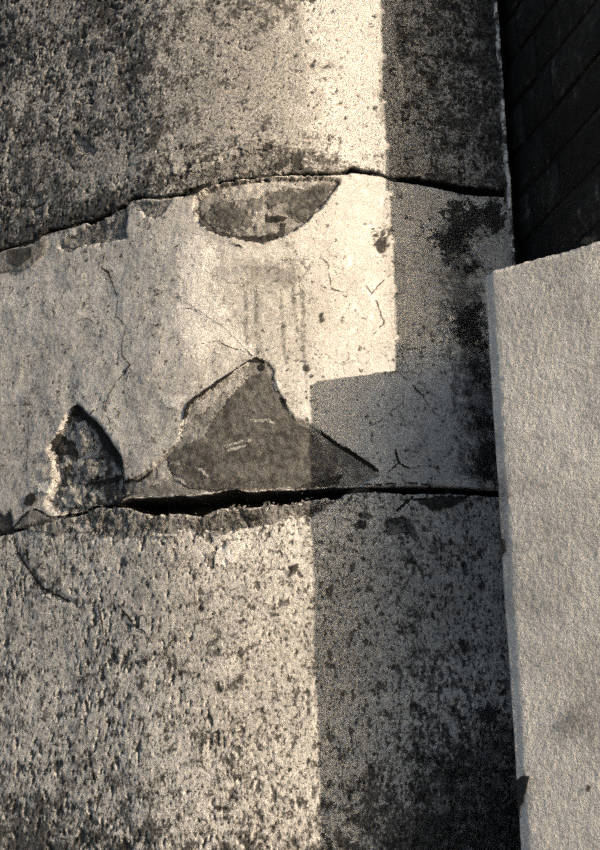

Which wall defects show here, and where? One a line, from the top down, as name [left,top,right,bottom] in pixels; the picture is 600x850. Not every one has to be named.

spalling [165,141,341,244]
water stain [373,225,394,253]
crack [52,244,130,423]
water stain [418,196,508,493]
spalling [0,357,380,574]
spalling [384,515,418,541]
spalling [418,495,467,511]
crack [13,534,76,606]
crack [85,603,150,677]